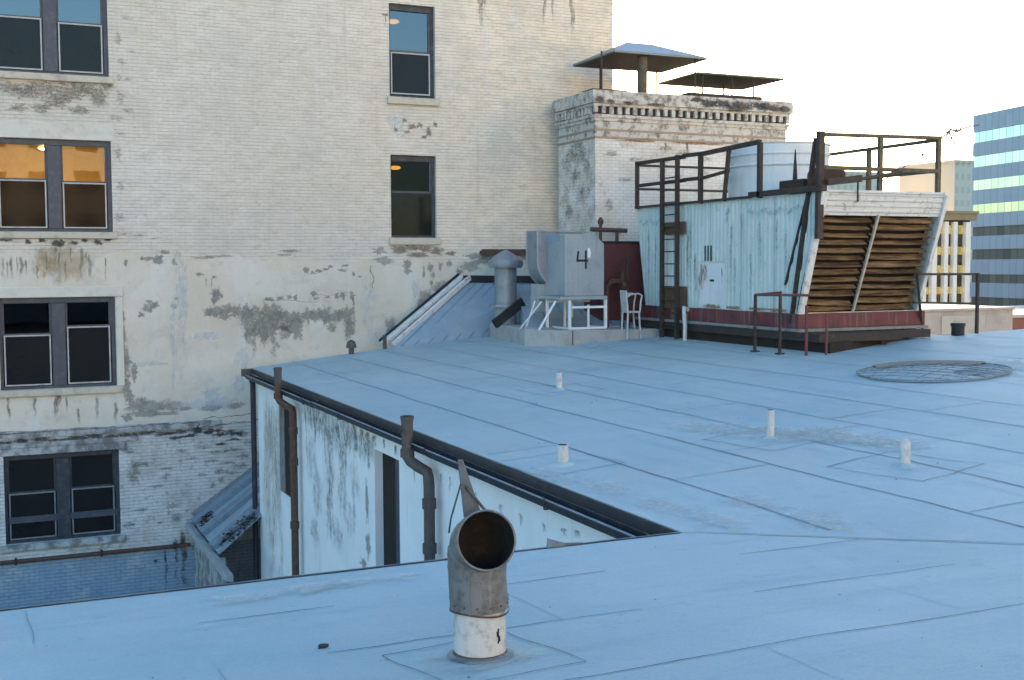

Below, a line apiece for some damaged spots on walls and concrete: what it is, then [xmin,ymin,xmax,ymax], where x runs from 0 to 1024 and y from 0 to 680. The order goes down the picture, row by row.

peeling [0,81,123,114]
peeling [394,118,438,138]
damp [0,239,112,273]
peeling [196,272,355,341]
peeling [123,312,137,402]
spalling [0,415,251,487]